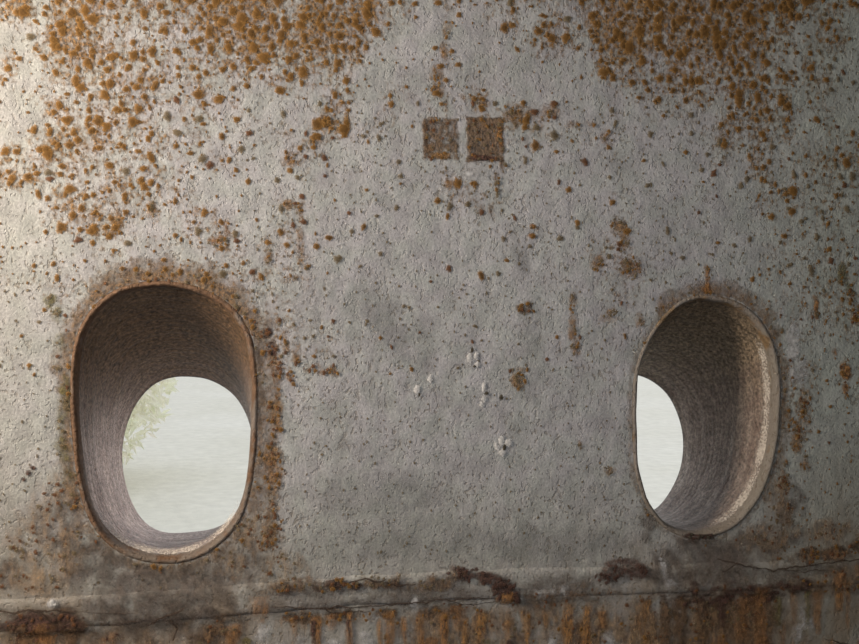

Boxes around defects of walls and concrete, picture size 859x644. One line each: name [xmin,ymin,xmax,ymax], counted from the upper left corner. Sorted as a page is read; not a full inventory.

rust [425,0,859,565]
crack [719,559,859,573]
crack [272,578,496,614]
crack [0,608,185,641]